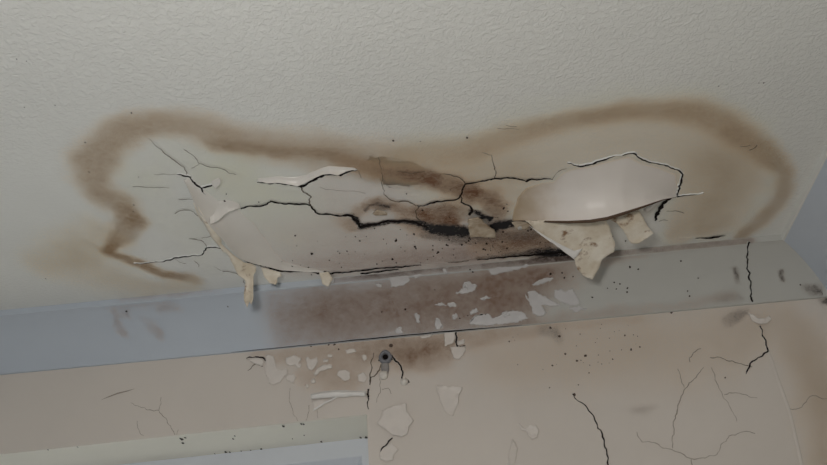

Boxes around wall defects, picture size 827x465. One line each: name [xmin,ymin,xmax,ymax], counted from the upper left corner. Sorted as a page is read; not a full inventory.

crack [133,140,236,216]
crack [241,151,703,229]
leakage [11,77,798,395]
crack [219,261,419,282]
peeling [375,274,424,288]
peeling [488,264,528,275]
peeling [435,277,587,326]
crack [745,241,754,302]
peeling [420,318,466,359]
peeling [246,354,367,411]
crack [637,326,769,464]
crack [572,394,609,465]